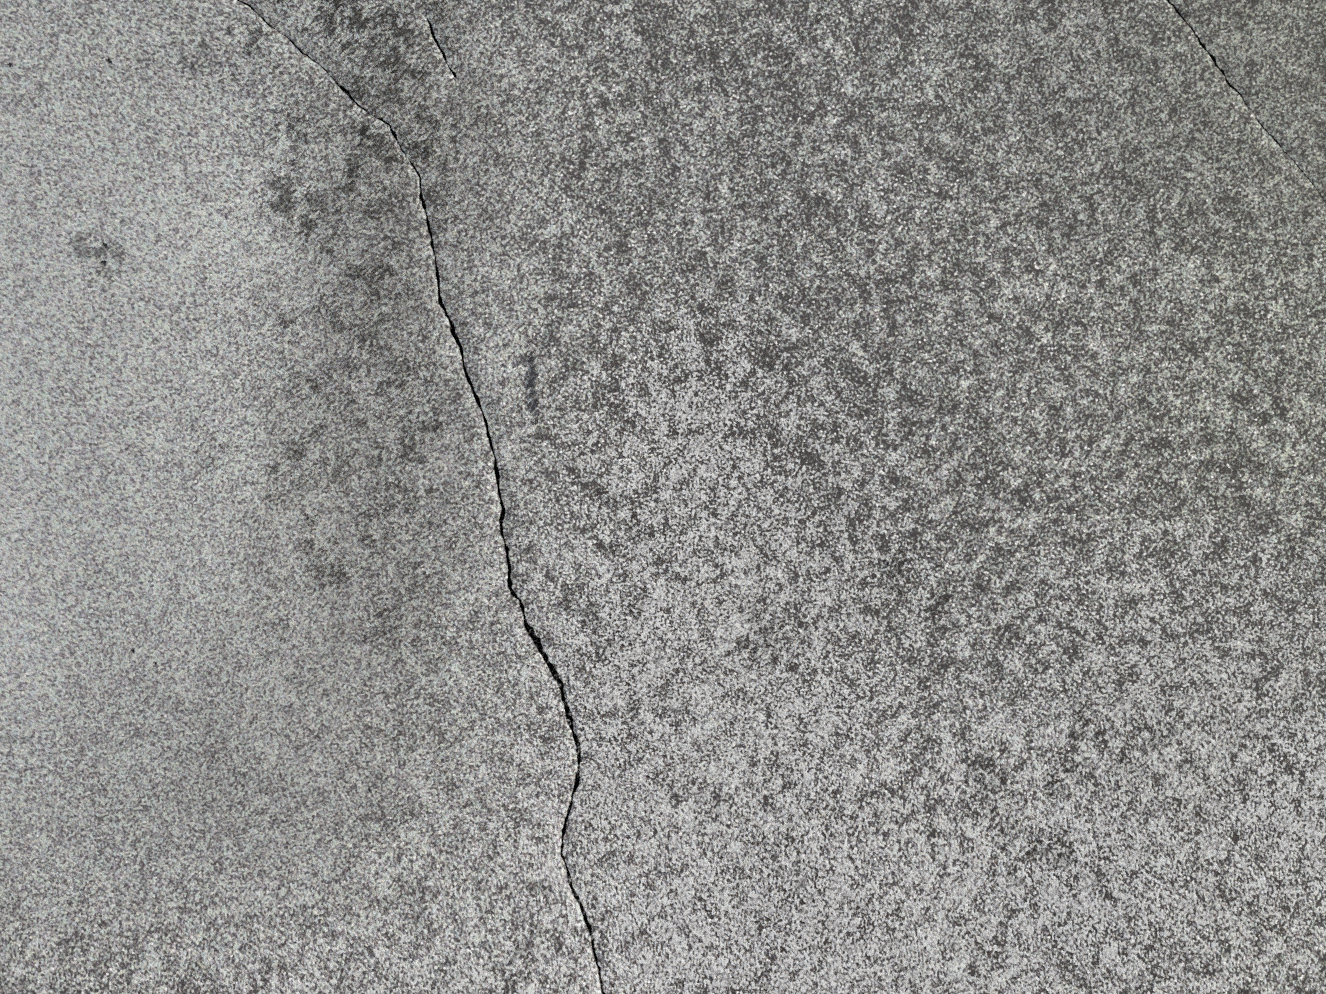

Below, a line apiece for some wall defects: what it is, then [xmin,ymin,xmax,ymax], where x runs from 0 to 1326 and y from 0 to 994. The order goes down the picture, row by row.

crack [237,0,605,994]